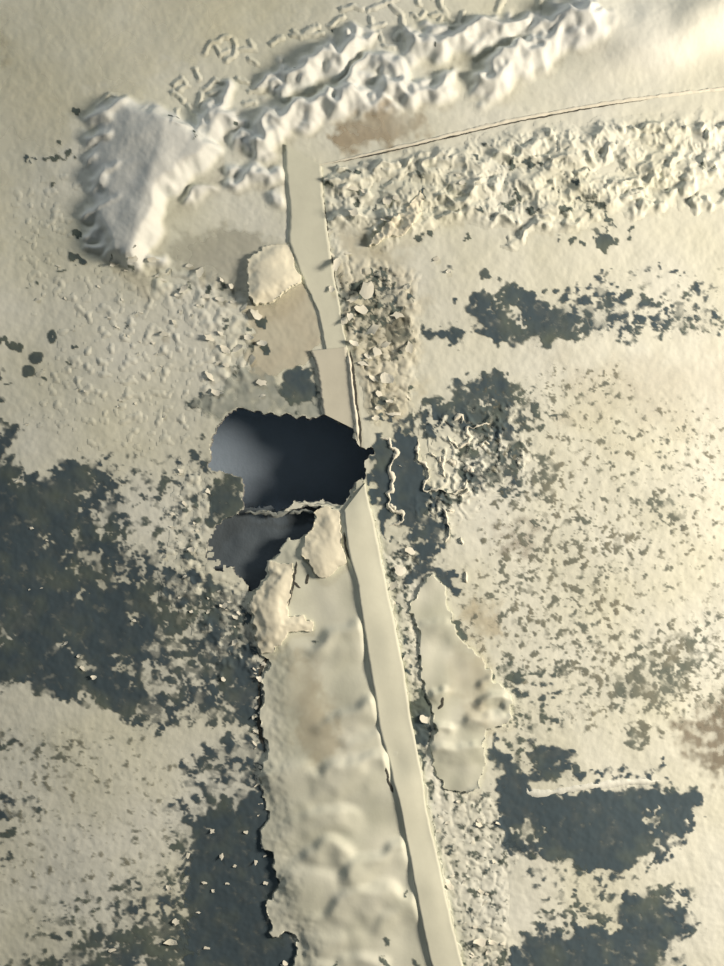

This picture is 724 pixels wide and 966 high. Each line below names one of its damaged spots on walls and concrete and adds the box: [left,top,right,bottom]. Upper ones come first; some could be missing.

crack [319,87,724,165]
water stain [0,336,47,381]
water stain [247,317,267,331]
water stain [278,366,320,415]
spalling [328,190,424,425]
water stain [338,266,724,368]
water stain [0,418,297,966]
peeling [107,242,432,966]
spalling [371,509,522,966]
water stain [367,365,724,966]